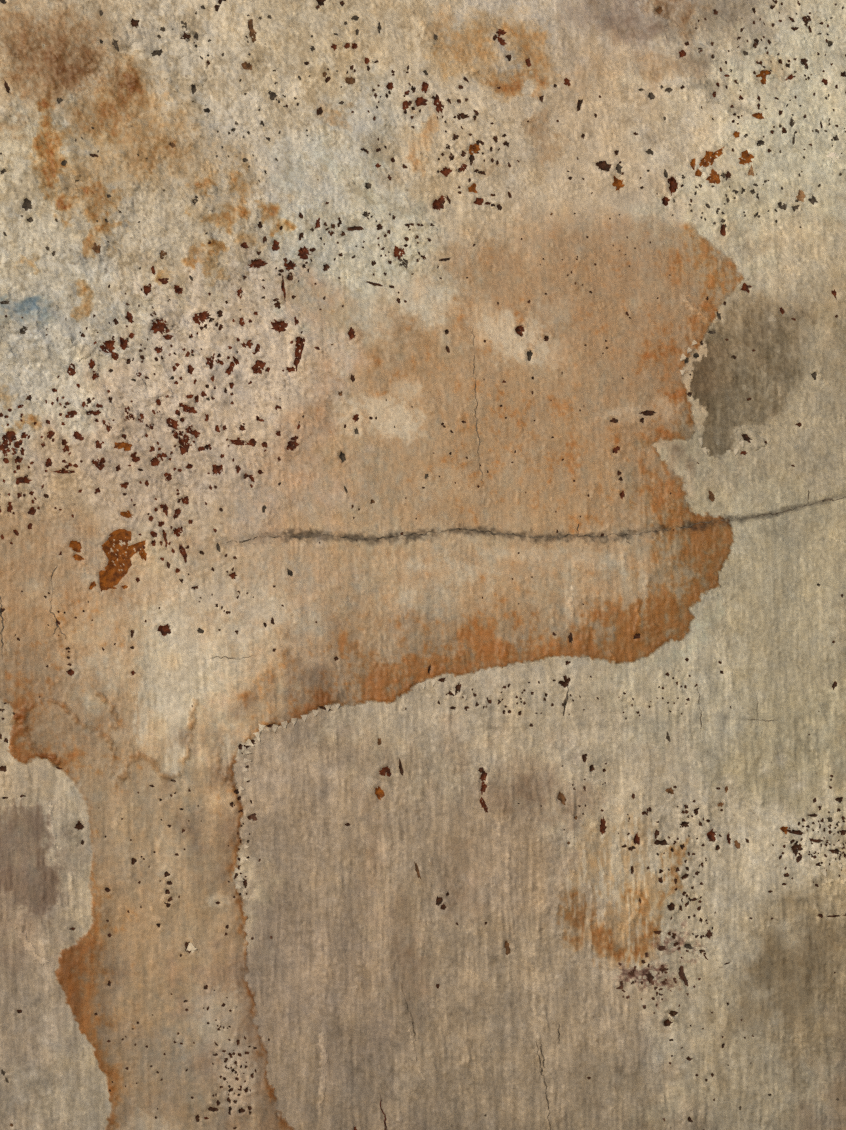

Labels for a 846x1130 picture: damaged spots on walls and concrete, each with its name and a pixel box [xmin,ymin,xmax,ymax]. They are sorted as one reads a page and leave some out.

corrosion [0,0,299,288]
corrosion [313,98,357,135]
corrosion [401,0,713,180]
corrosion [754,44,800,84]
crack [219,330,846,549]
leakage [666,267,846,478]
corrosion [0,191,746,1130]